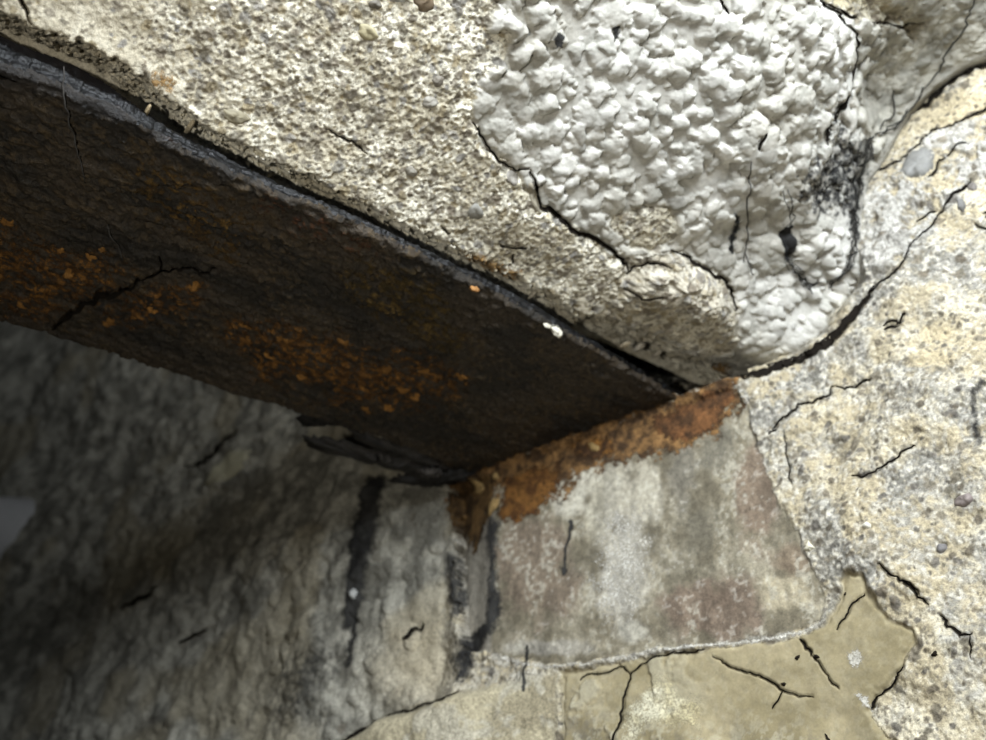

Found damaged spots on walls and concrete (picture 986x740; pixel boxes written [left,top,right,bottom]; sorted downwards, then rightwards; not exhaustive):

rust [0,207,206,334]
spalling [0,0,734,385]
crack [474,124,738,312]
crack [741,178,971,378]
crack [820,0,926,146]
crack [878,63,986,177]
peeling [295,414,338,427]
rust [210,313,474,419]
peeling [365,453,476,488]
rust [444,362,747,554]
water stain [444,552,469,618]
water stain [452,517,502,682]